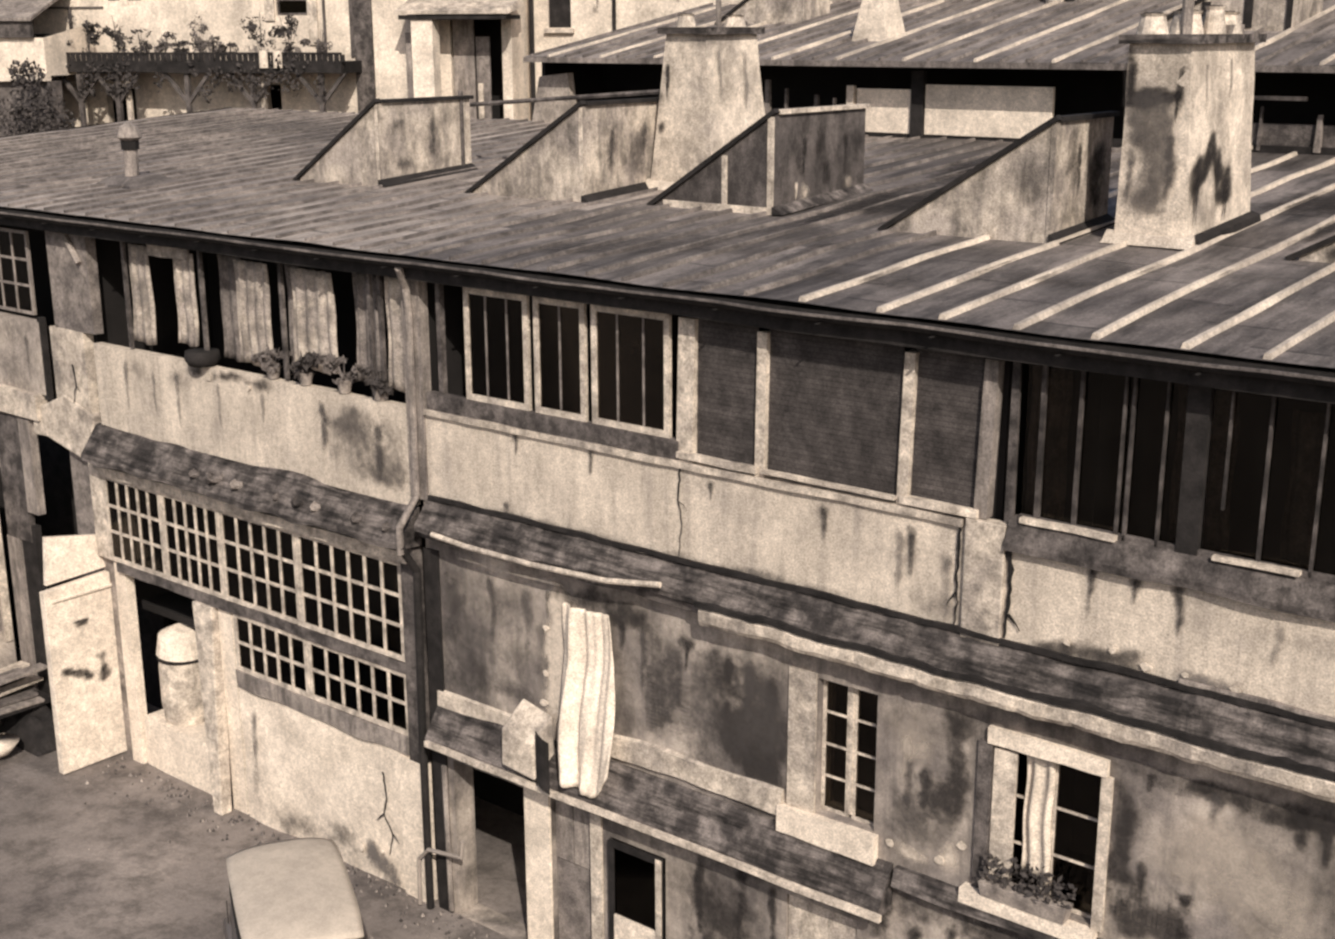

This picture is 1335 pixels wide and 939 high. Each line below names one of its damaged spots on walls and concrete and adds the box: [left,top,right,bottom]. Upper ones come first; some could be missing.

damp [319,405,404,485]
crack [946,527,962,624]
crack [1003,551,1020,638]
damp [1172,587,1184,631]
damp [567,589,786,788]
damp [897,712,972,830]
damp [1107,785,1190,939]
damp [1174,781,1335,939]